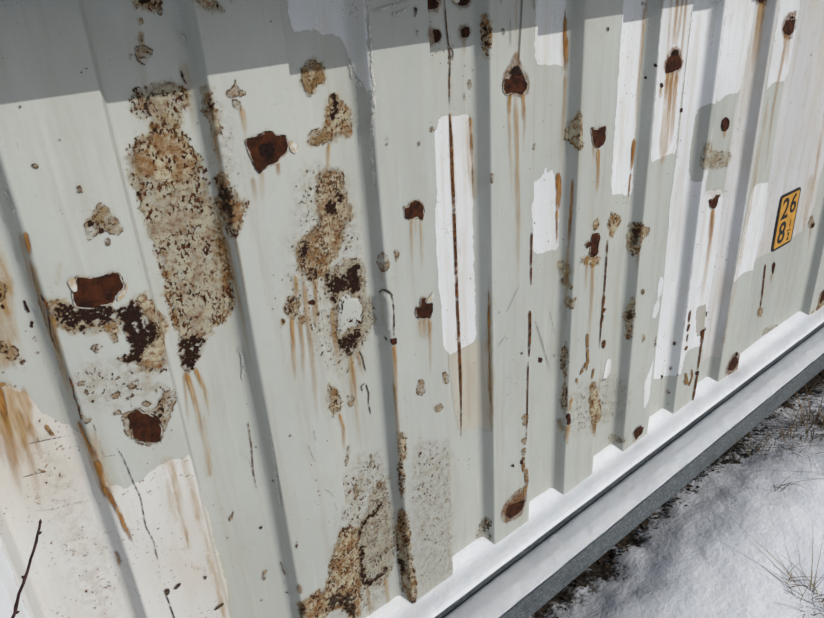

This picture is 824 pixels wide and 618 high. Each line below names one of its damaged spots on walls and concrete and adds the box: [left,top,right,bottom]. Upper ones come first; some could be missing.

rust [245,131,299,173]
rust [307,93,353,153]
rust [33,71,250,446]
rust [282,165,376,376]
rust [0,341,25,365]
rust [0,383,29,427]
rust [501,457,529,523]
rust [286,432,453,618]